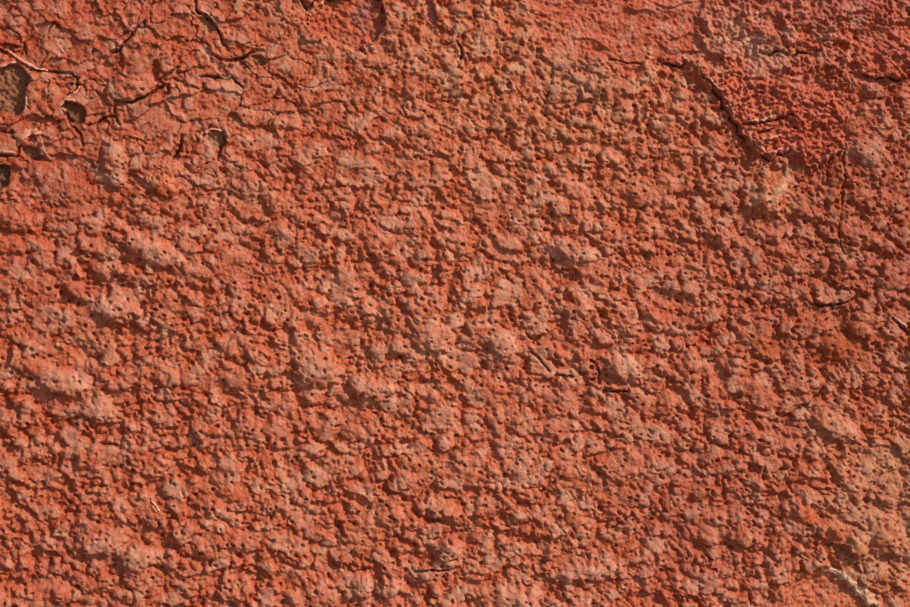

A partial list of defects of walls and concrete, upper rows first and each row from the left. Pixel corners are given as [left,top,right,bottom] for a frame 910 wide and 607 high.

crack [103,16,142,56]
peeling [199,17,231,80]
crack [195,1,264,86]
peeling [0,61,30,115]
peeling [59,98,86,125]
crack [0,44,178,146]
crack [664,62,796,162]
peeling [0,165,10,190]
crack [0,146,20,157]
peeling [17,128,52,161]
crack [811,103,847,254]
spalling [777,567,881,607]